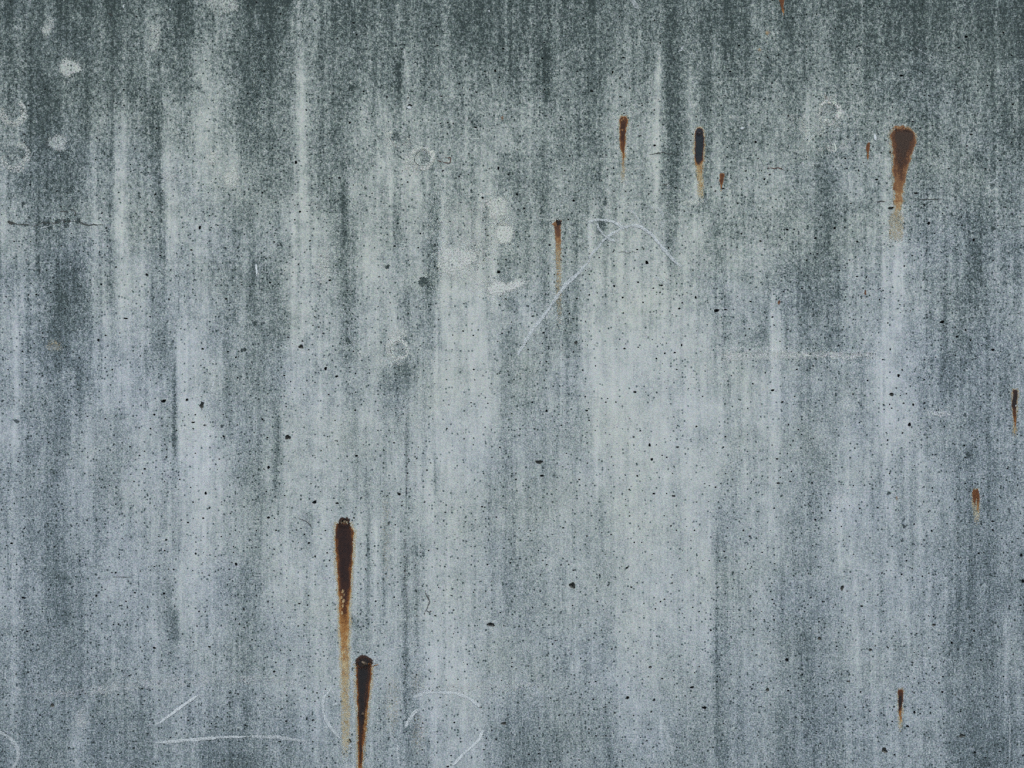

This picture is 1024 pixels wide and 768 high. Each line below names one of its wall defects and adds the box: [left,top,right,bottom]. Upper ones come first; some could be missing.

corrosion [618,115,629,178]
corrosion [692,127,706,198]
corrosion [889,125,917,239]
corrosion [552,220,562,314]
corrosion [1011,390,1019,433]
corrosion [972,489,980,520]
corrosion [333,517,378,768]